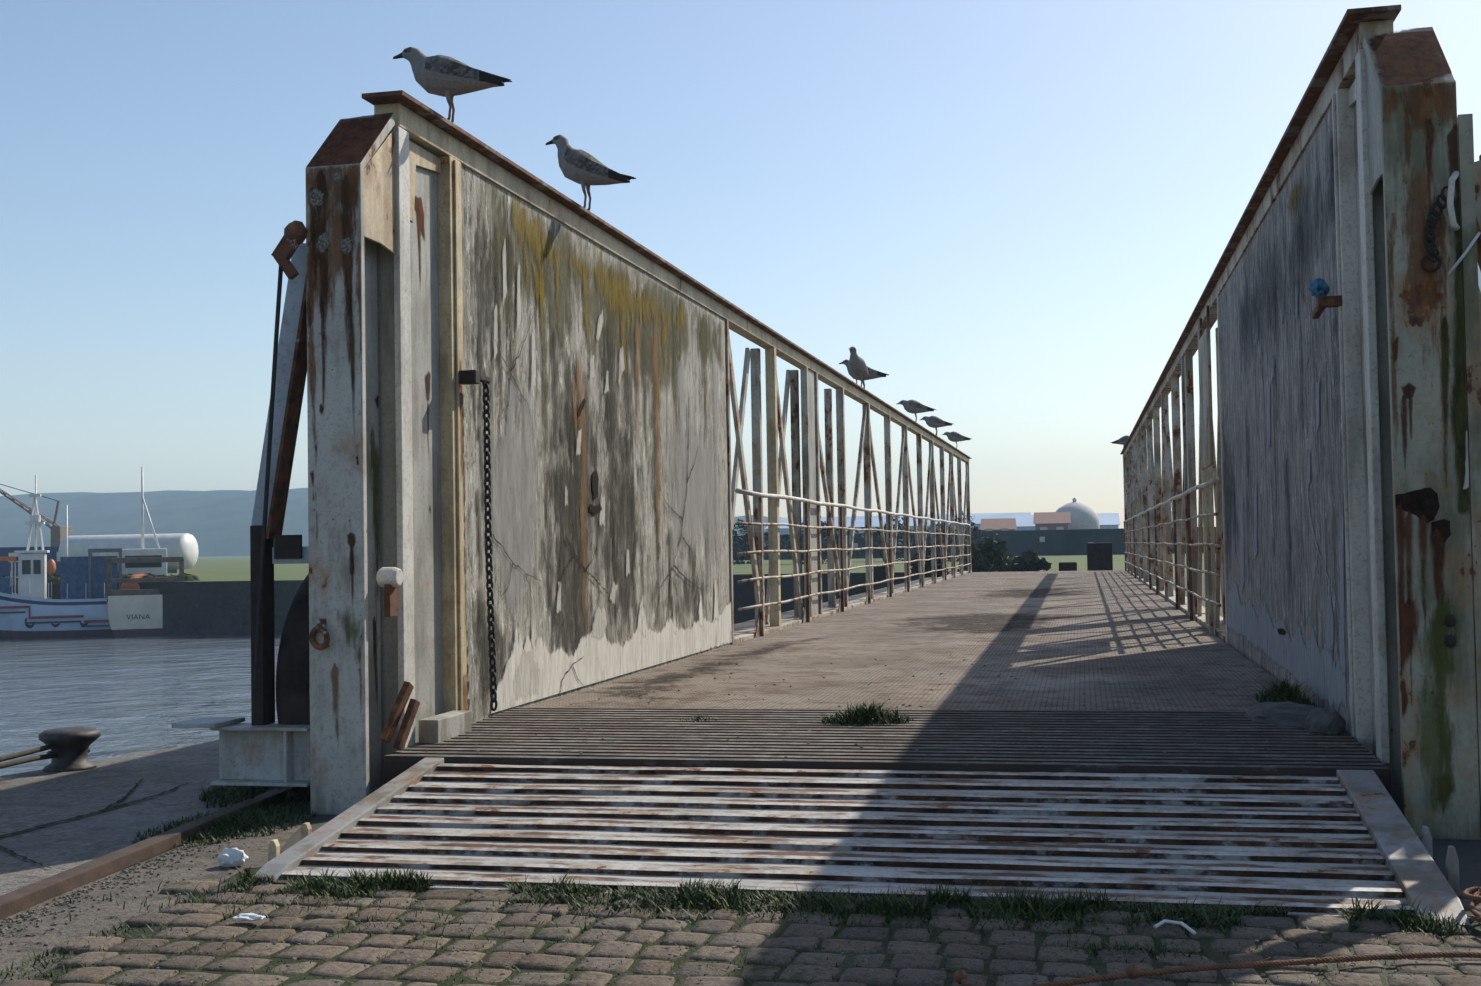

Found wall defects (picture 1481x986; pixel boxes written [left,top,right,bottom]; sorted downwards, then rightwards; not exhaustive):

corrosion [306,112,394,451]
water stain [1239,125,1336,437]
corrosion [1369,27,1459,486]
corrosion [358,617,378,702]
crack [493,534,608,611]
water stain [464,181,723,712]
water stain [606,642,789,699]
water stain [1222,422,1249,584]
corrosion [1396,505,1445,716]
crack [0,779,188,869]